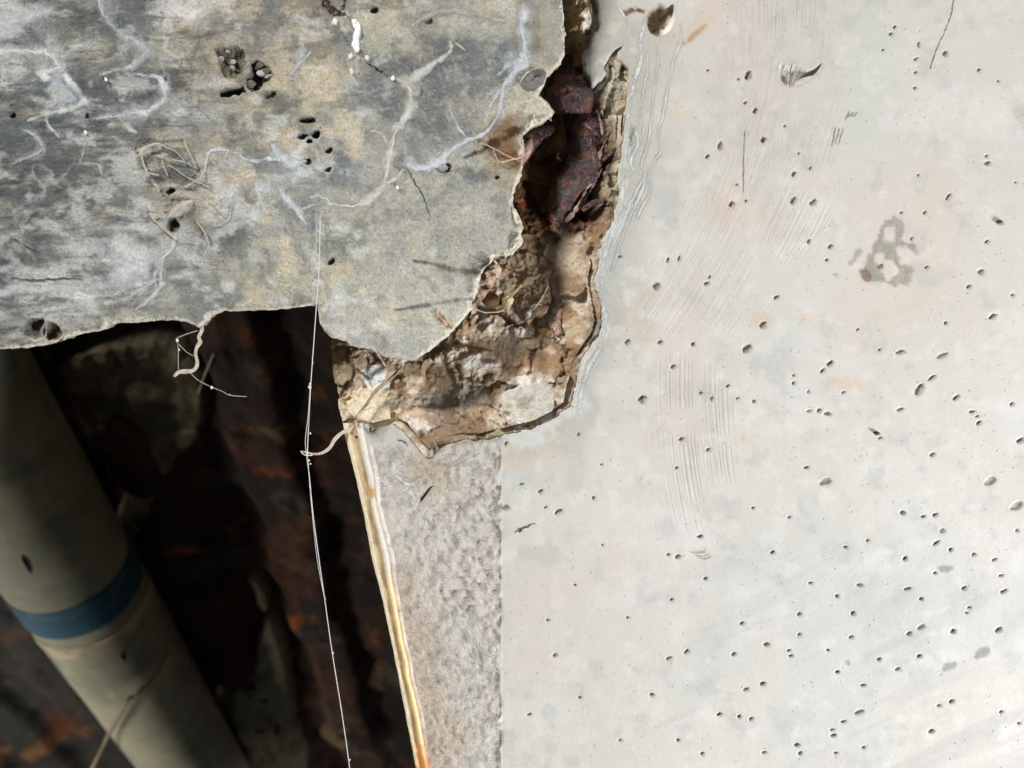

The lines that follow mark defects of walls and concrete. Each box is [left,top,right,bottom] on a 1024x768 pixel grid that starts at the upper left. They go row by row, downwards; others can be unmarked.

spalling [562,0,599,75]
corrosion [464,54,616,227]
spalling [331,47,629,458]
water stain [851,219,916,286]